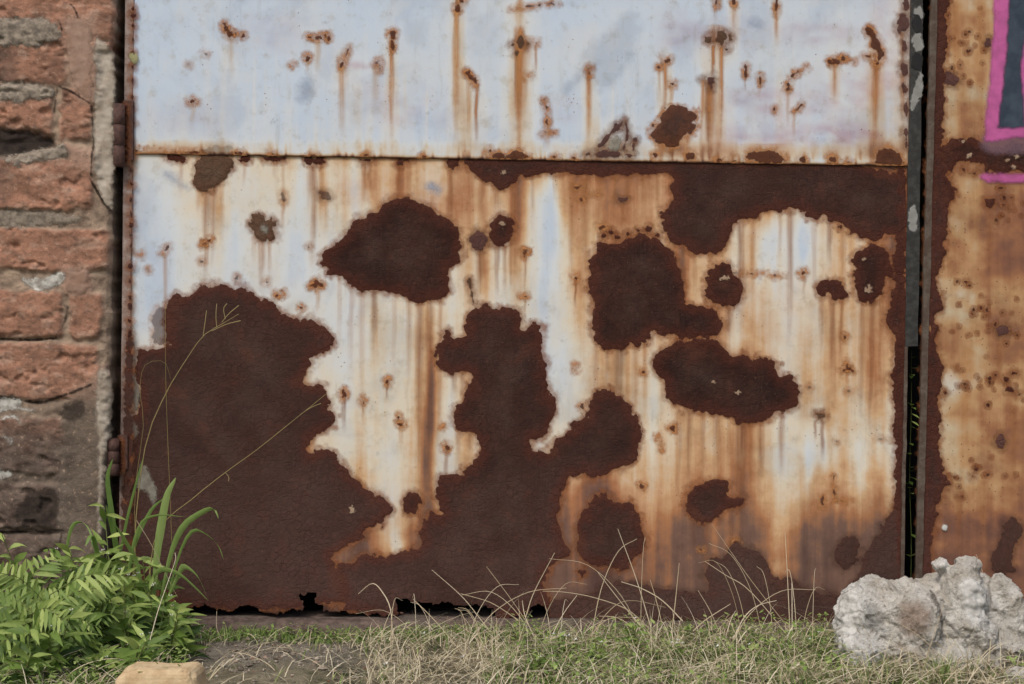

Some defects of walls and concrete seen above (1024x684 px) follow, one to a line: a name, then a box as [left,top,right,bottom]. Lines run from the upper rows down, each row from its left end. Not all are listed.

corrosion [220,21,245,40]
corrosion [289,32,331,70]
corrosion [338,46,351,71]
corrosion [375,28,397,87]
corrosion [134,145,286,193]
corrosion [306,195,532,305]
corrosion [446,0,910,584]
corrosion [921,0,1024,576]
corrosion [120,275,839,623]